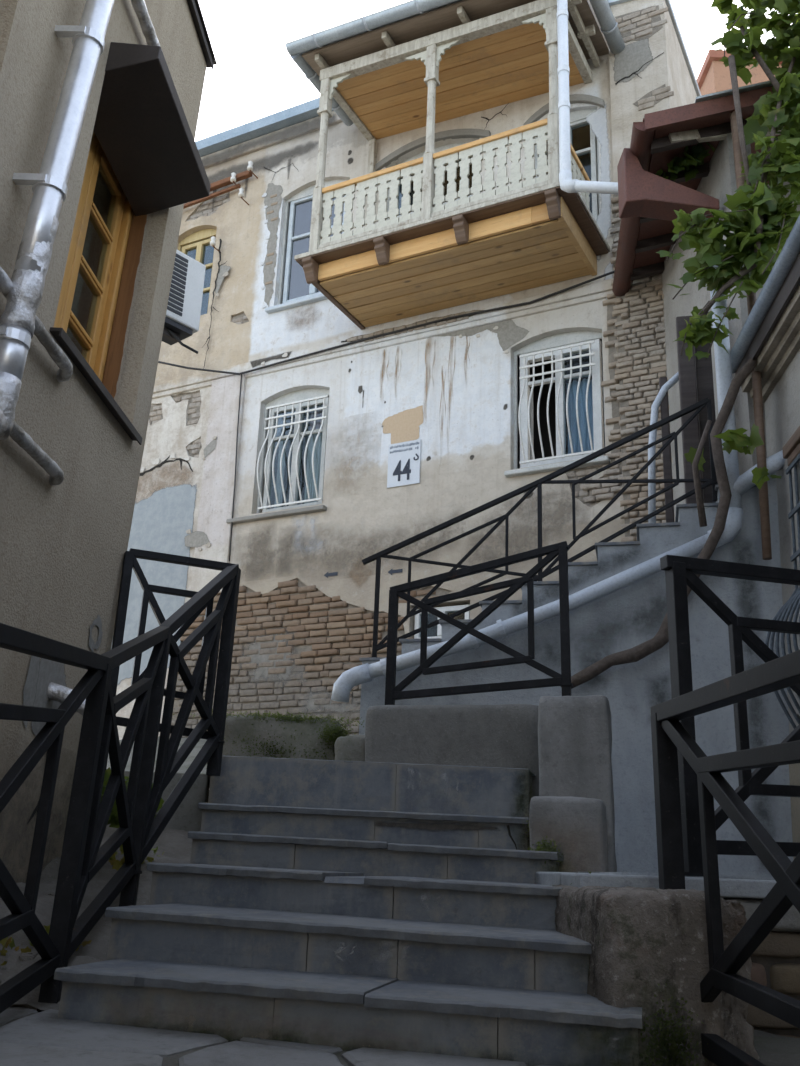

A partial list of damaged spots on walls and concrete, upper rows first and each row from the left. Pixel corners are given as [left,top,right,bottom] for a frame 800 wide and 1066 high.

flaking render [615,5,668,43]
crack [615,52,664,85]
flaking render [260,183,283,308]
flaking render [149,391,217,460]
crack [140,453,193,476]
flaking render [164,593,222,738]
flaking render [226,579,452,736]